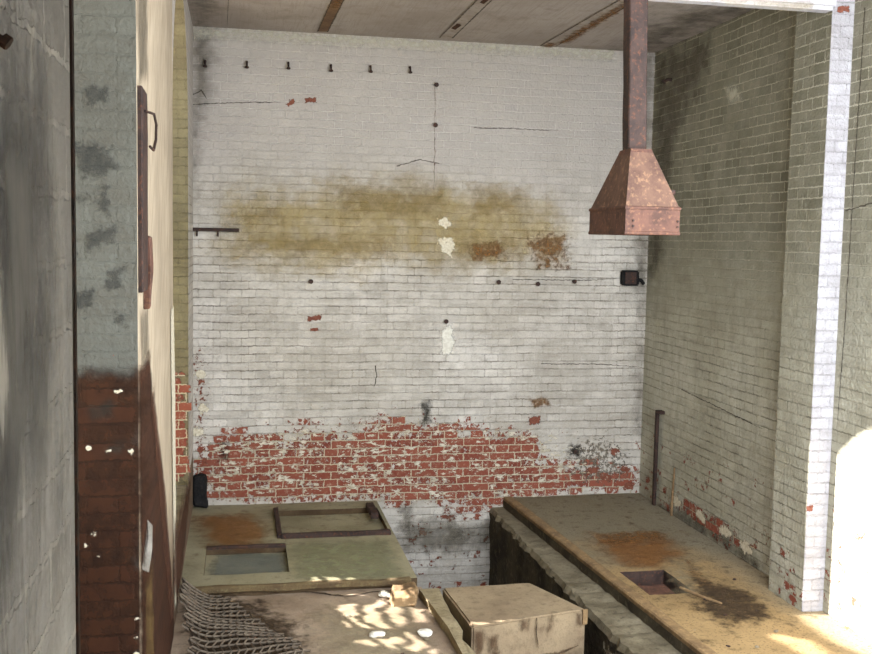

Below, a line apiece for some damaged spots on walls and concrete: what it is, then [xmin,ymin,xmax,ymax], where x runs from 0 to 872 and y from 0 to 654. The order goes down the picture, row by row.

damp [657,45,707,179]
peeling [437,217,455,258]
corrosion [472,242,502,261]
corrosion [528,233,570,269]
peeling [0,301,8,432]
peeling [171,305,640,602]
peeling [660,492,758,555]
spalling [584,629,617,654]